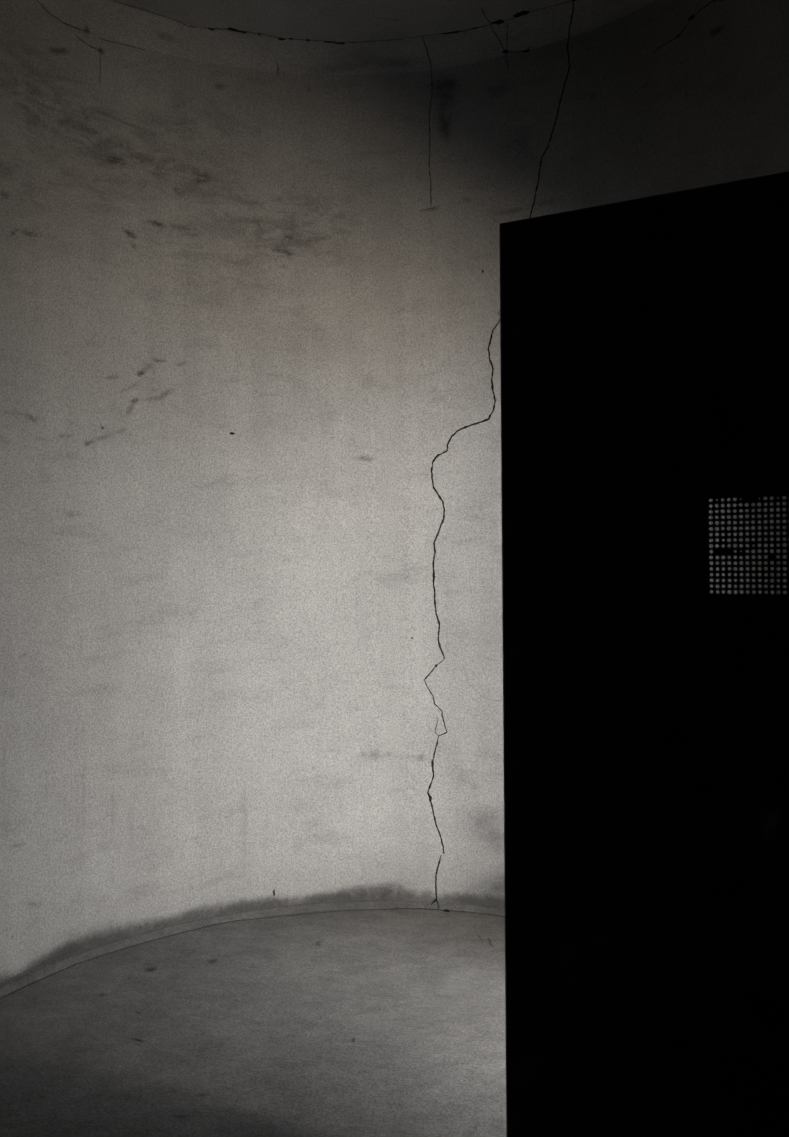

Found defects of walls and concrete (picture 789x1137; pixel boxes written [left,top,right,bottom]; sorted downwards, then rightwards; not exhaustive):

crack [37,0,144,84]
crack [111,0,576,218]
crack [424,311,500,912]